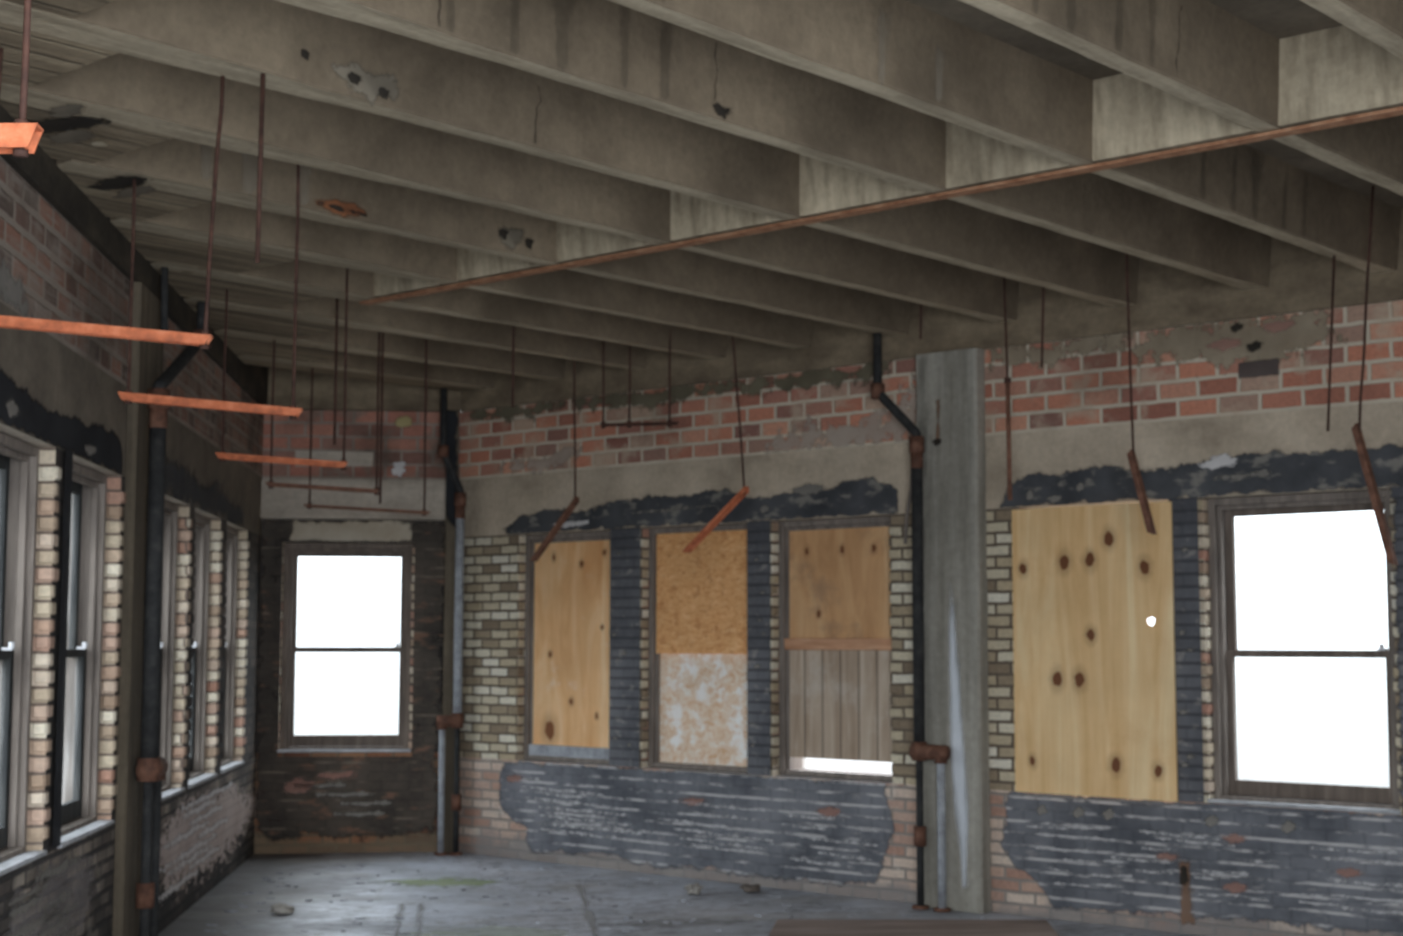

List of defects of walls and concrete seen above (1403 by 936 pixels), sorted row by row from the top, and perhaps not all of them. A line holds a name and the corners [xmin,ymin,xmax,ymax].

rust [359,106,1403,305]
peeling [0,369,122,474]
spalling [1238,358,1279,378]
peeling [499,477,898,887]
peeling [1000,444,1403,936]
peeling [159,771,256,908]
flaking render [284,771,357,794]